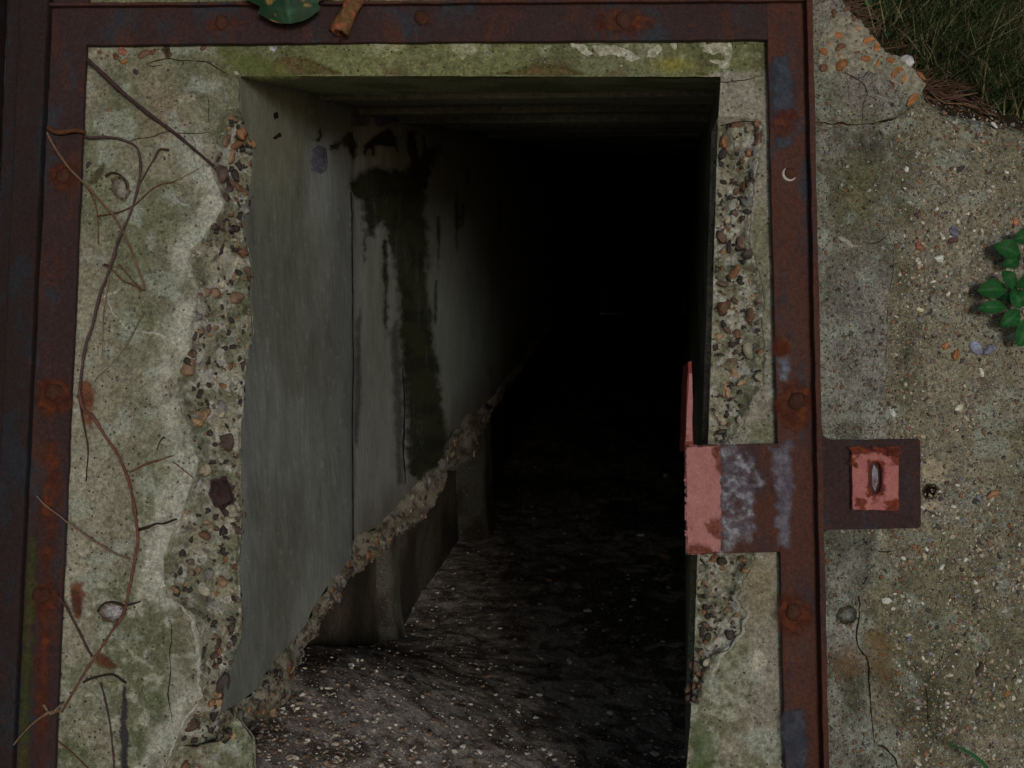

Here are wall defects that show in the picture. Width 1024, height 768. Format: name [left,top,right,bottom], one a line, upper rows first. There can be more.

rust [70,583,84,618]
rust [81,381,93,425]
crack [348,192,356,541]
spalling [164,113,577,768]
leakage [317,128,447,482]
crack [400,368,408,483]
rust [688,519,722,553]
spalling [684,553,754,705]
spalling [706,119,765,445]
peeling [751,650,768,673]
rust [849,446,901,511]
crack [856,577,898,767]